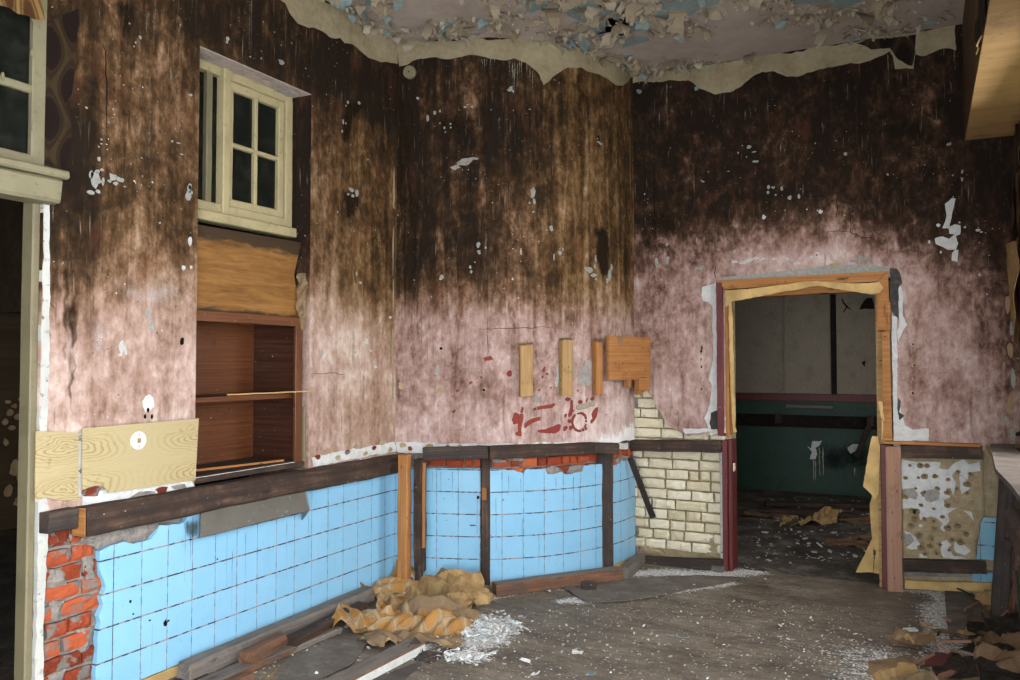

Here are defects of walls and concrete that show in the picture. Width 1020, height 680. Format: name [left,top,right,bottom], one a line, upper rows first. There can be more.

peeling [311,0,956,94]
peeling [87,157,126,195]
peeling [451,157,479,170]
peeling [584,255,613,283]
damp [597,229,608,273]
peeling [928,198,983,262]
damp [63,270,76,342]
spalling [573,355,591,386]
flaking render [604,249,889,558]
flaking render [312,441,598,474]
spalling [901,458,984,560]
flaking render [32,522,159,680]